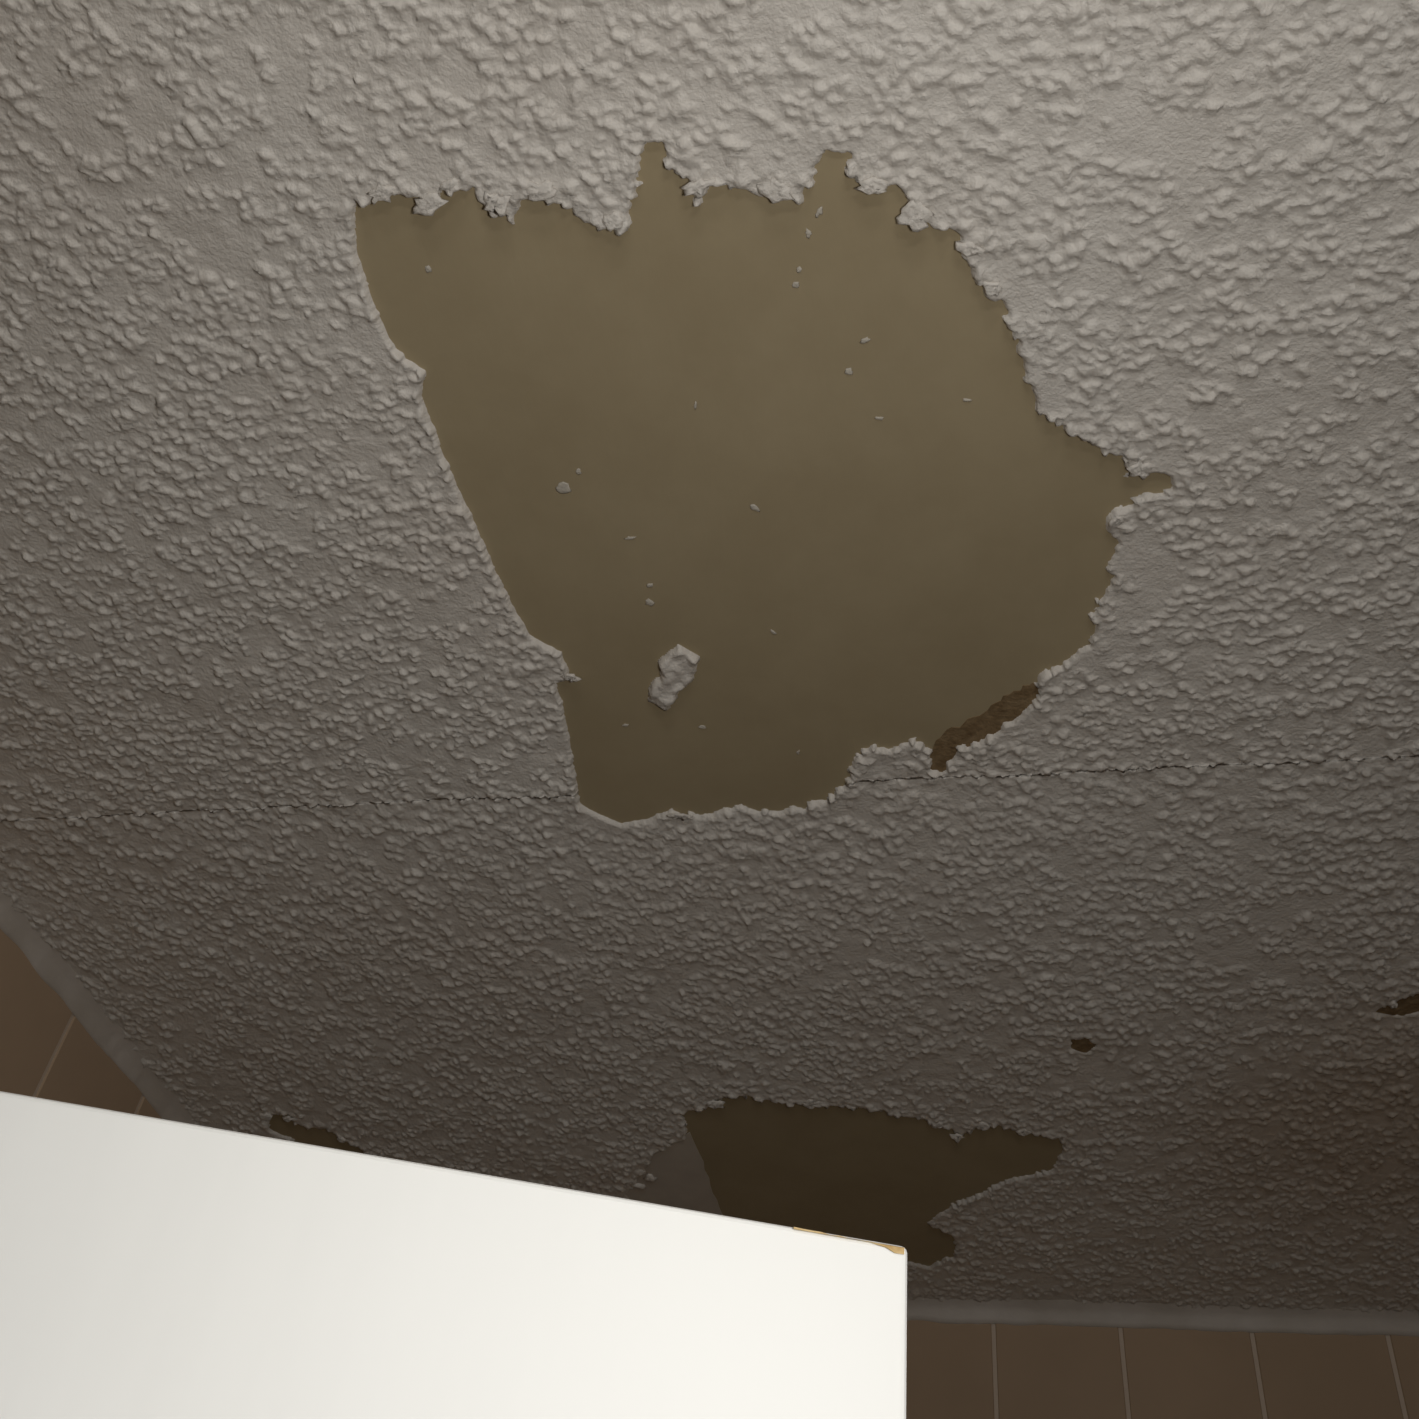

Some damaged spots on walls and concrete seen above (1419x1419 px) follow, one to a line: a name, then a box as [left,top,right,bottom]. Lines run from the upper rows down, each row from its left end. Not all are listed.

peeling [355,141,1172,823]
peeling [1376,994,1419,1016]
peeling [259,1113,364,1154]
peeling [626,1096,1063,1266]